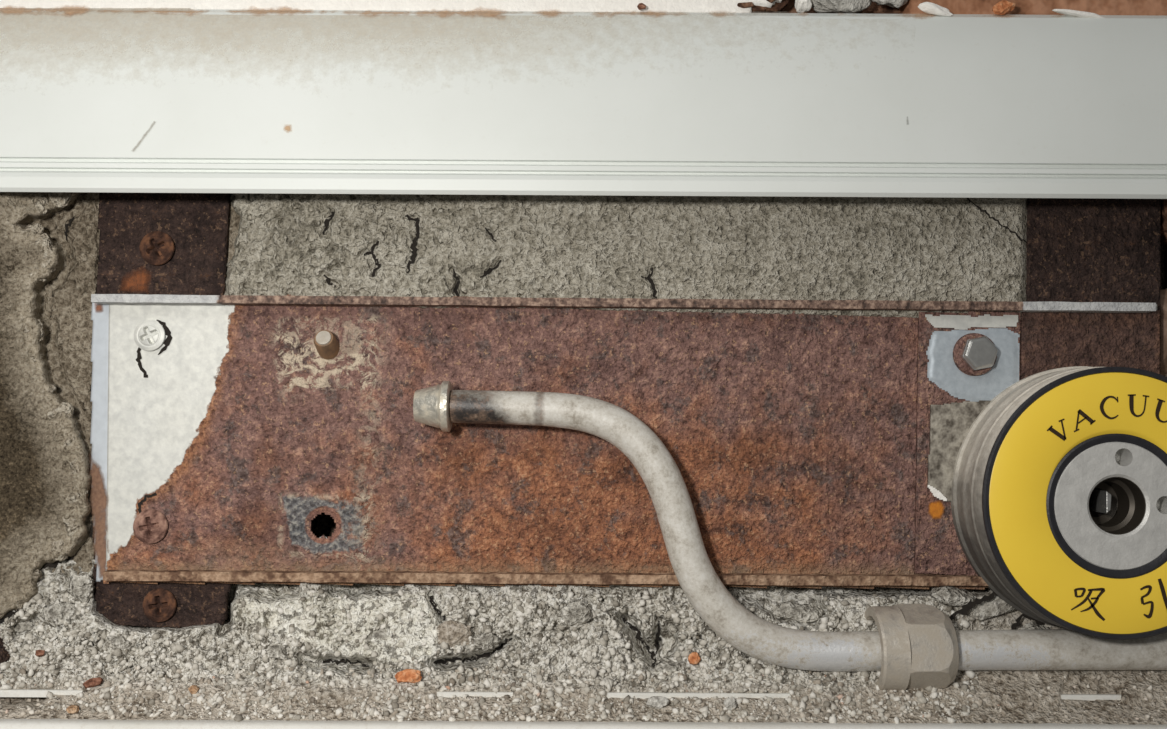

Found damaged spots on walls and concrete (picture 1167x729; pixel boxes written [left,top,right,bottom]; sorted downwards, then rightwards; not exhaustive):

rust [125,272,147,289]
crack [322,211,335,235]
crack [364,214,420,277]
crack [453,227,501,296]
crack [641,268,657,299]
rust [1020,310,1160,380]
rust [90,295,944,589]
crack [429,595,445,621]
crack [433,638,513,665]
crack [623,617,661,667]